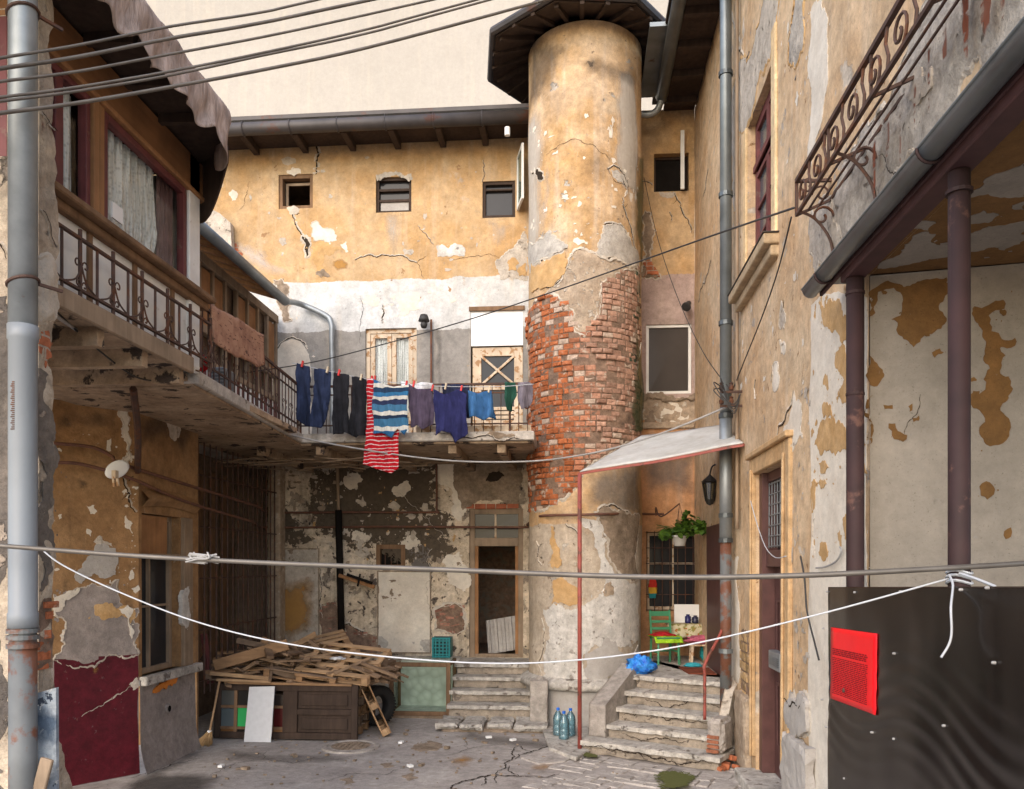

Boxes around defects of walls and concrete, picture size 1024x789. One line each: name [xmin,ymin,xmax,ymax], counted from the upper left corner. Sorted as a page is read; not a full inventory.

flaking render [732,0,830,214]
crack [292,213,305,239]
crack [356,226,497,276]
crack [533,139,708,288]
flaking render [495,190,695,532]
flaking render [86,529,113,547]
peeling [285,464,472,654]
flaking render [573,503,640,583]
peeling [783,291,846,789]
flaking render [38,561,140,670]
crack [449,744,548,789]